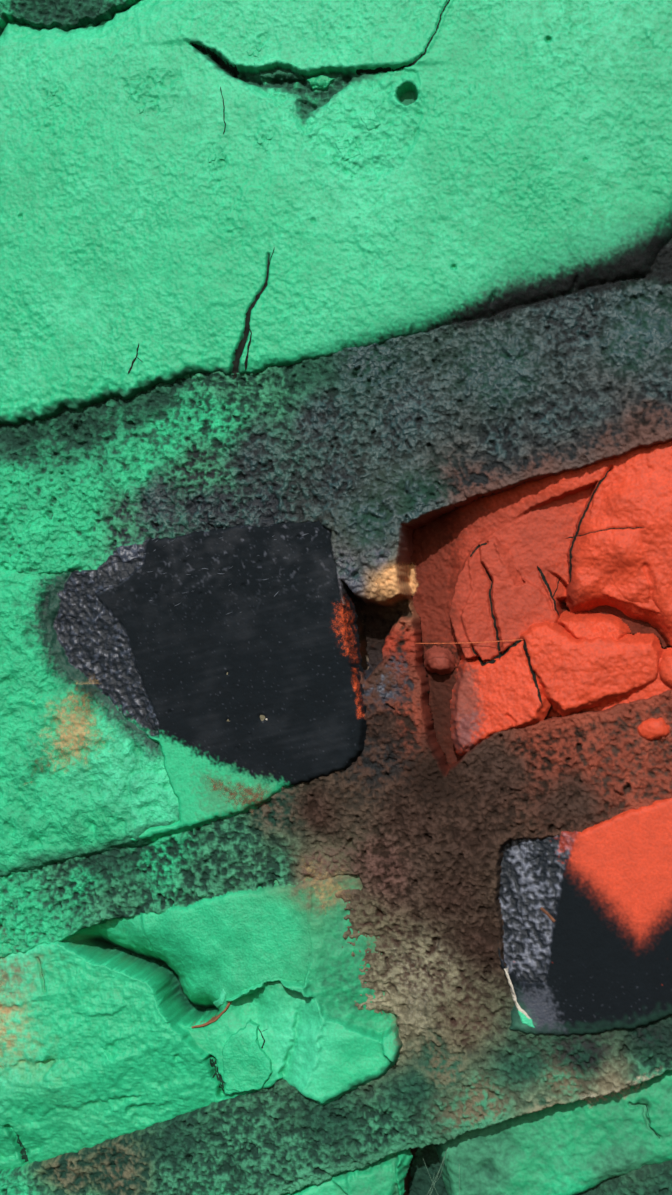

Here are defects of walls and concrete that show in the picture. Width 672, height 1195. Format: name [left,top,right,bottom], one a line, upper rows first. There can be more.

crack [190,43,239,134]
crack [356,0,450,75]
crack [232,247,275,379]
spalling [47,541,159,735]
crack [470,543,542,704]
spalling [450,440,672,755]
crack [537,468,642,616]
spalling [60,880,311,1029]
spalling [222,1019,273,1092]